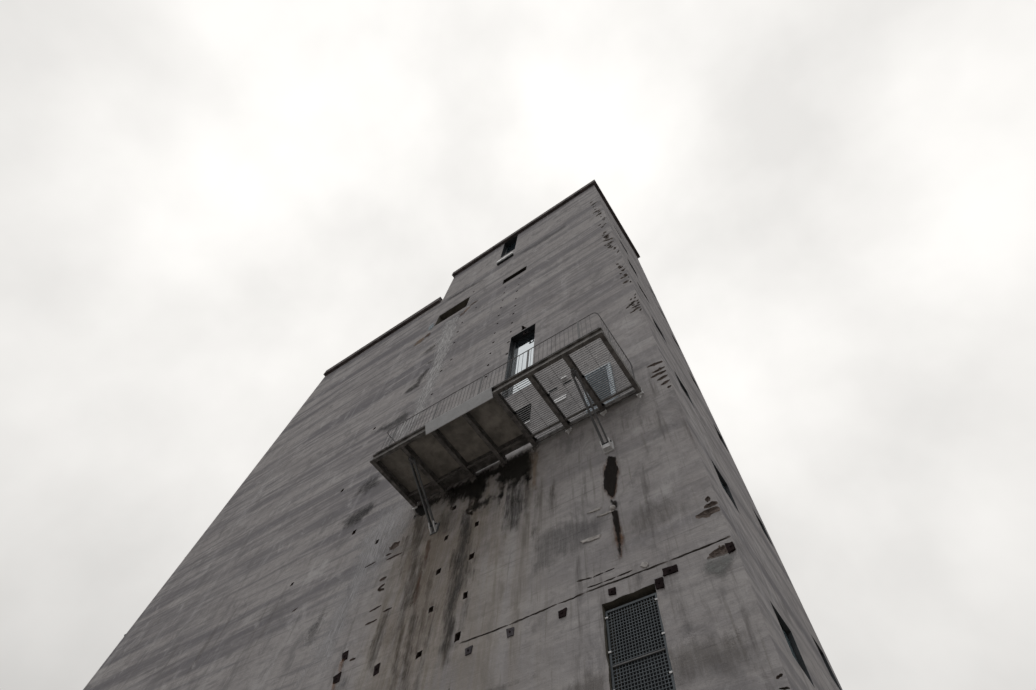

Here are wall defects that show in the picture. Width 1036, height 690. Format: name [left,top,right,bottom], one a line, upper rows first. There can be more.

water stain [320,505,402,658]
water stain [414,451,532,637]